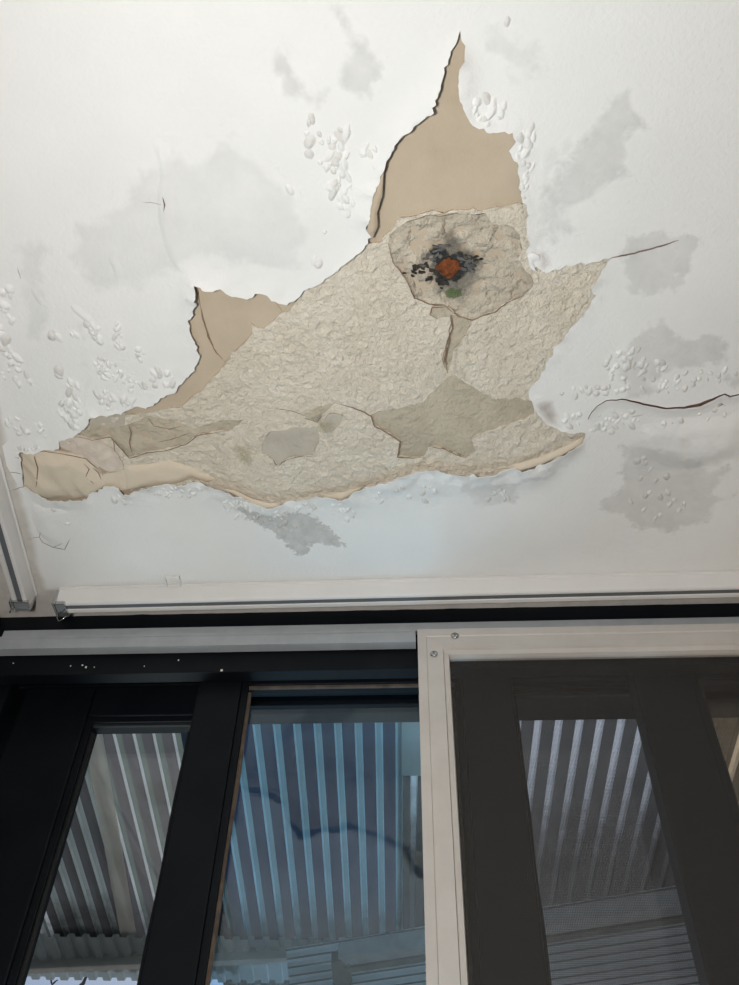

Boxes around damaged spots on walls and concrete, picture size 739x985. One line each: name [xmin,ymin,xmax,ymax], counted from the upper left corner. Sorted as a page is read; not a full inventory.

peeling [2,13,636,532]
corrosion [436,257,461,278]
crack [586,389,739,421]